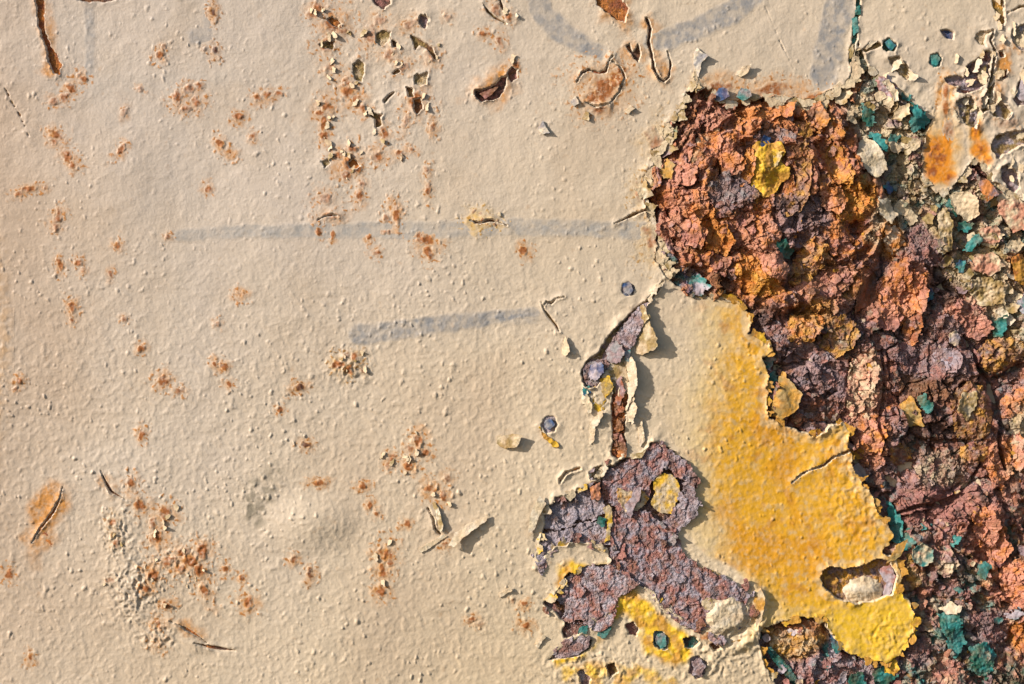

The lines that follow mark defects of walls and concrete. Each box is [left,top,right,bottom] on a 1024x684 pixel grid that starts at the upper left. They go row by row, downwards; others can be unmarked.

corrosion [297,0,539,271]
peeling [454,57,525,117]
peeling [587,0,648,66]
peeling [714,64,752,102]
peeling [945,0,1024,201]
corrosion [544,44,1024,684]
corrosion [98,465,269,659]
peeling [528,282,765,679]
crack [802,449,855,474]
peeling [820,539,908,603]